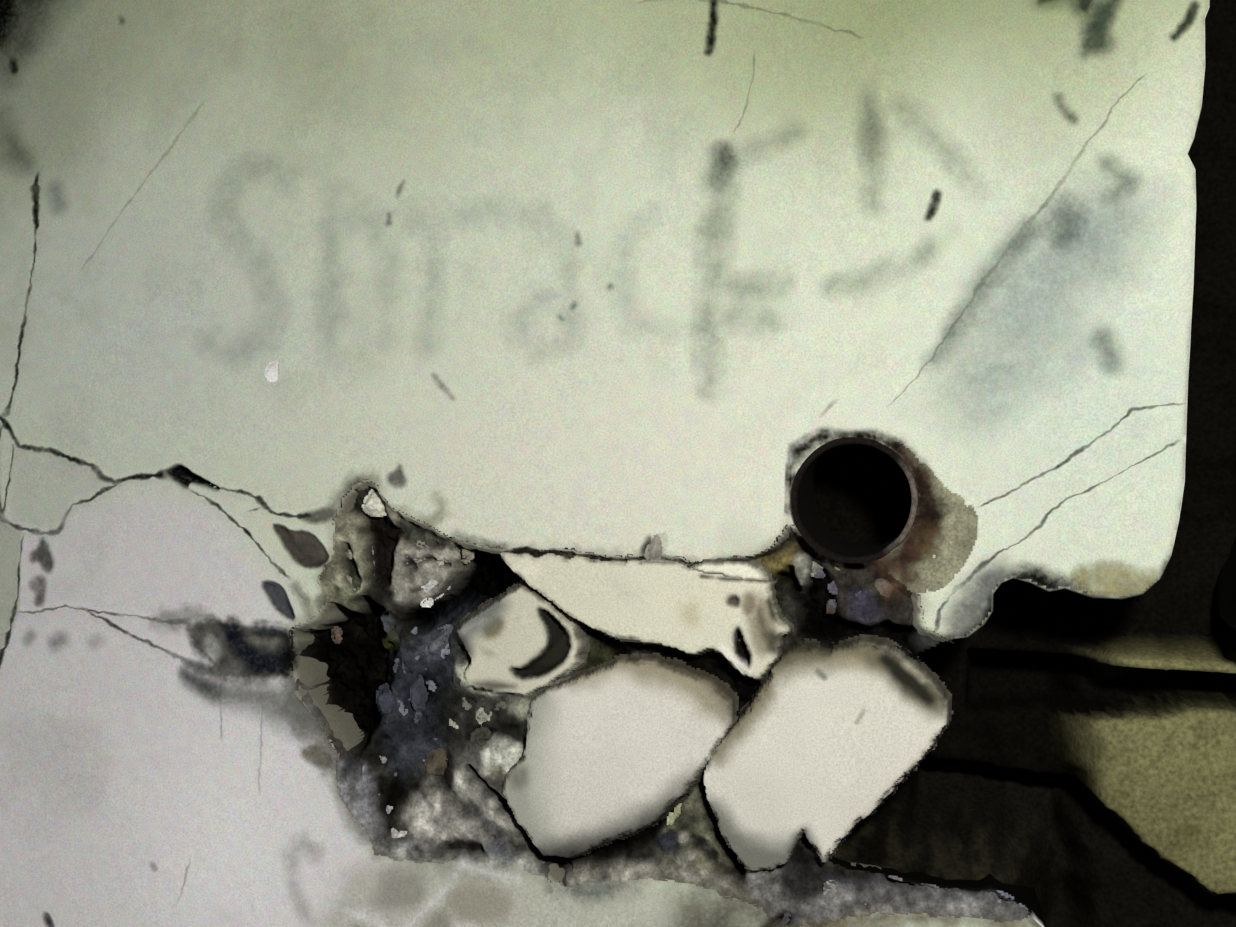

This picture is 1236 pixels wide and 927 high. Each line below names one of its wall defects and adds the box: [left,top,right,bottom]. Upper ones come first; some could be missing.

crack [0,175,164,665]
crack [197,489,309,576]
rust [786,429,941,592]
crack [973,550,1003,573]
crack [1033,448,1083,479]
spalling [165,464,1030,927]